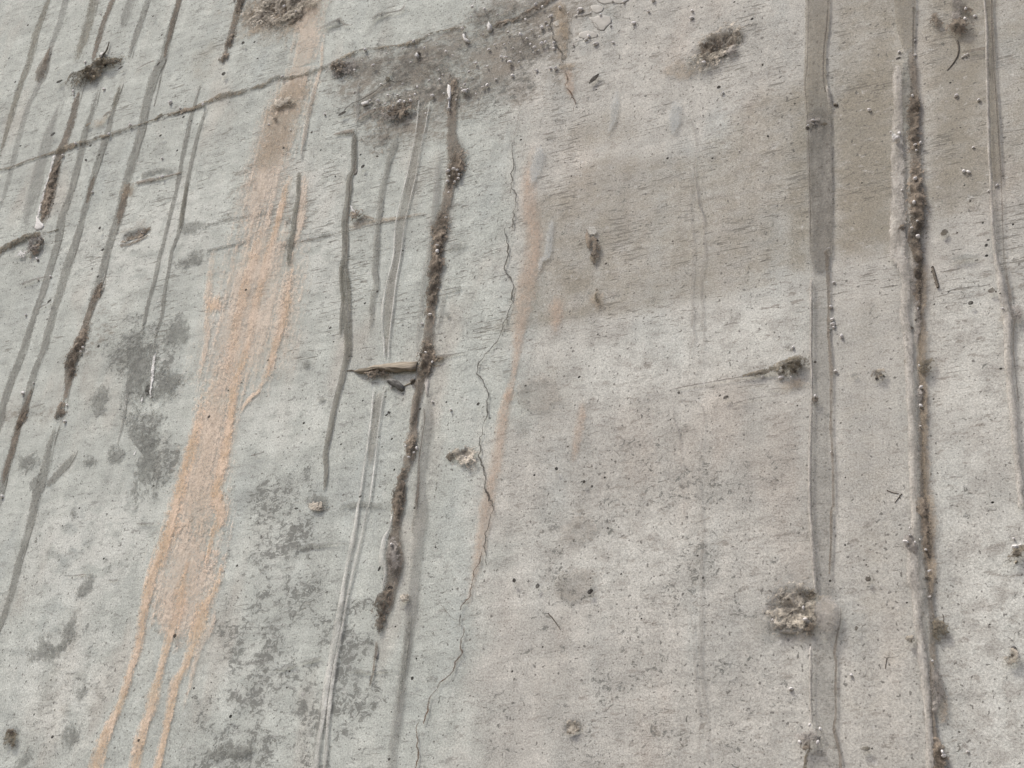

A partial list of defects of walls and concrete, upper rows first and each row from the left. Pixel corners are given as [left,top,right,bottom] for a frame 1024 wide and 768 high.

corrosion [121,76,318,768]
leakage [313,389,385,768]
crack [415,76,523,768]